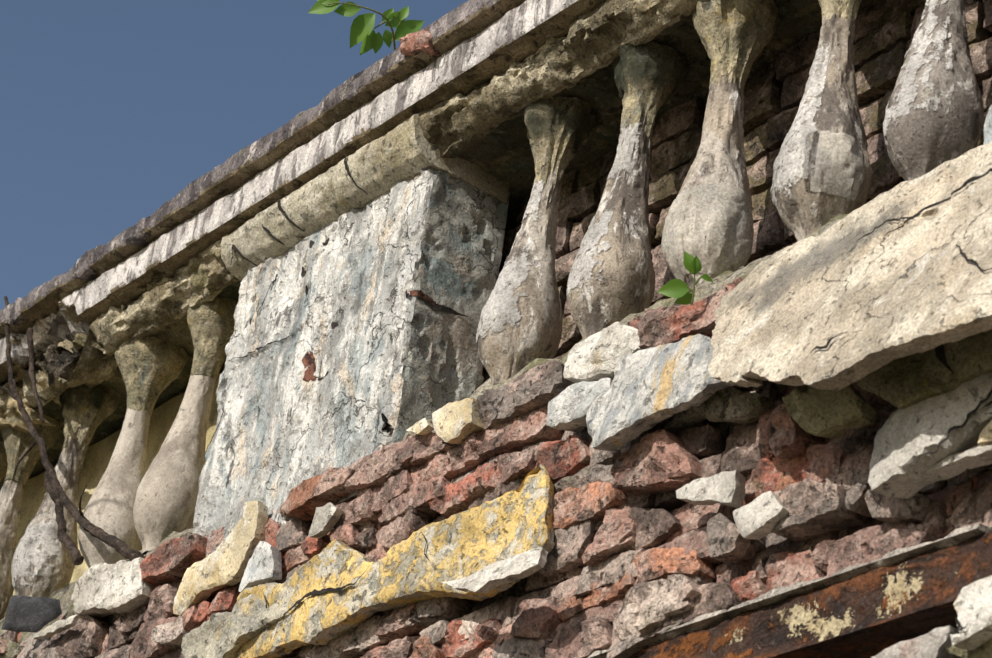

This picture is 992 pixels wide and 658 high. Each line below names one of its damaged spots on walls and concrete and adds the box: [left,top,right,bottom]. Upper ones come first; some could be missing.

crack [344,155,368,194]
crack [850,168,992,251]
spalling [125,216,152,247]
spalling [74,262,99,280]
crack [956,244,992,271]
crack [405,290,468,317]
spalling [34,331,88,386]
crack [935,344,954,374]
spalling [0,398,56,434]
crack [912,389,992,466]
peeling [11,513,61,591]
rust [640,628,752,658]